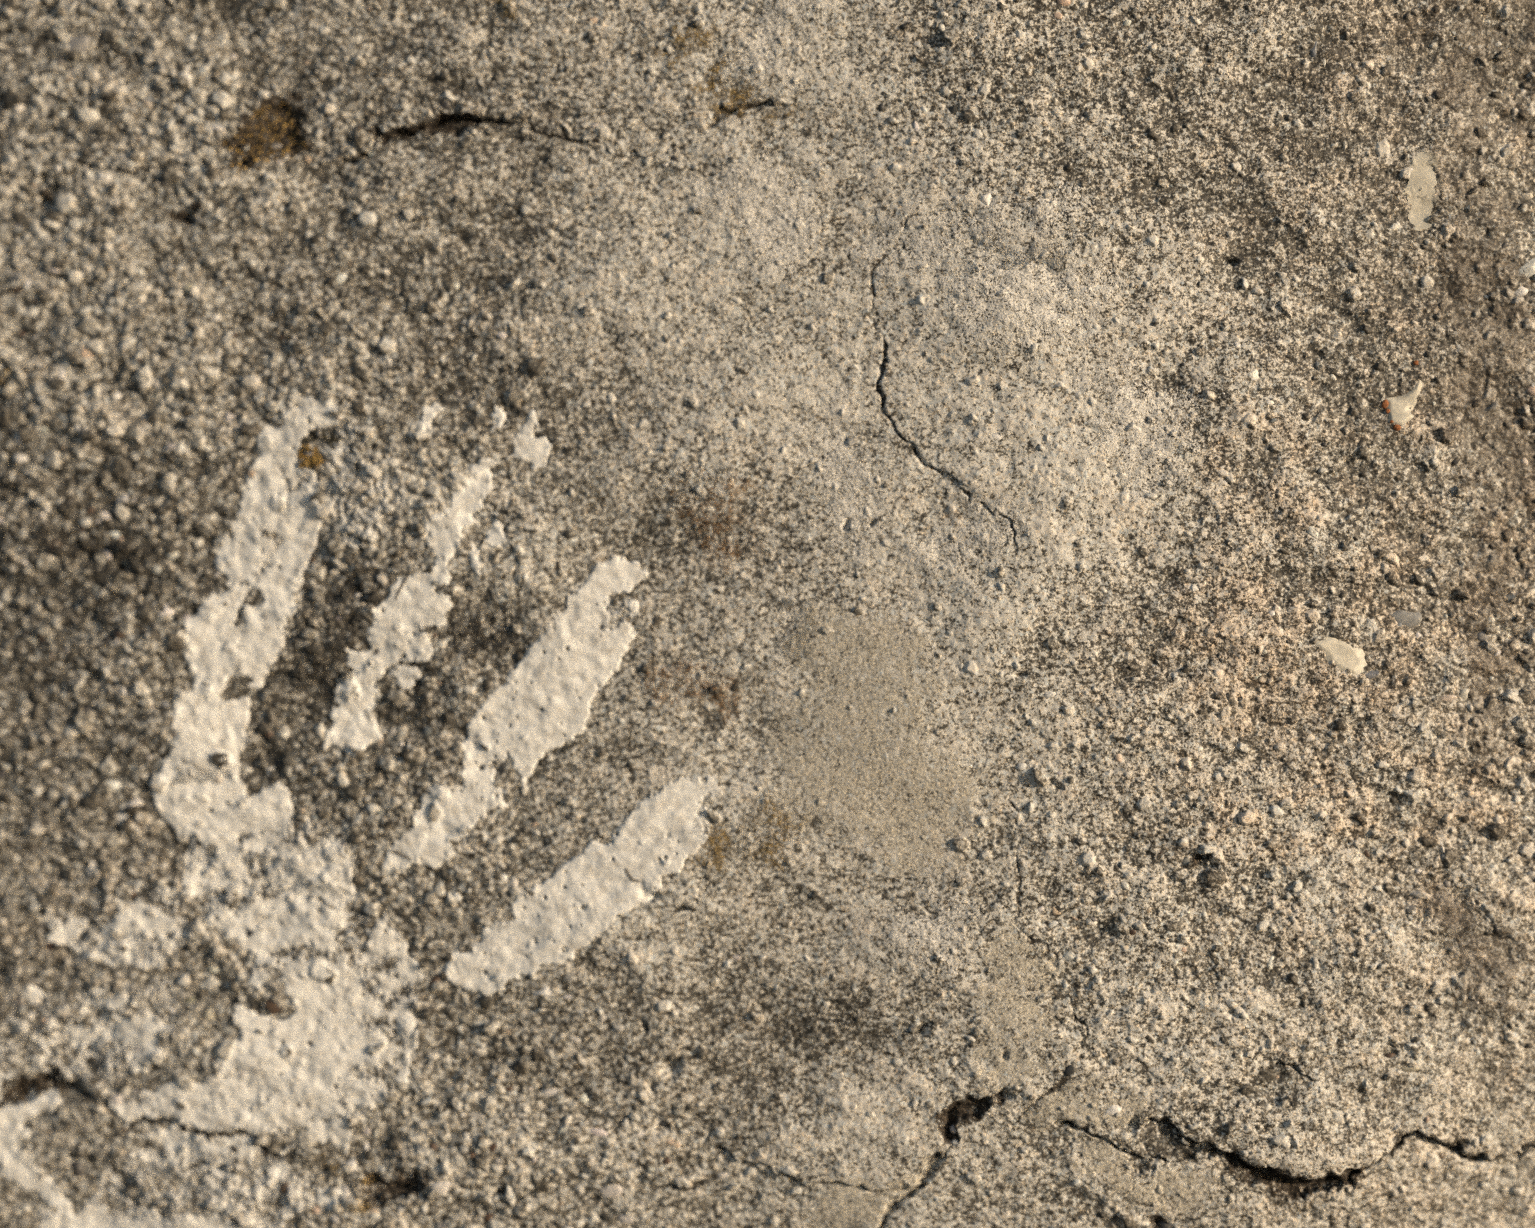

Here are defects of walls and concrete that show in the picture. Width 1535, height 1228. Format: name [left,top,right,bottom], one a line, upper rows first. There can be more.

crack [319,99,788,165]
crack [798,797,1535,1228]
crack [648,1145,745,1191]